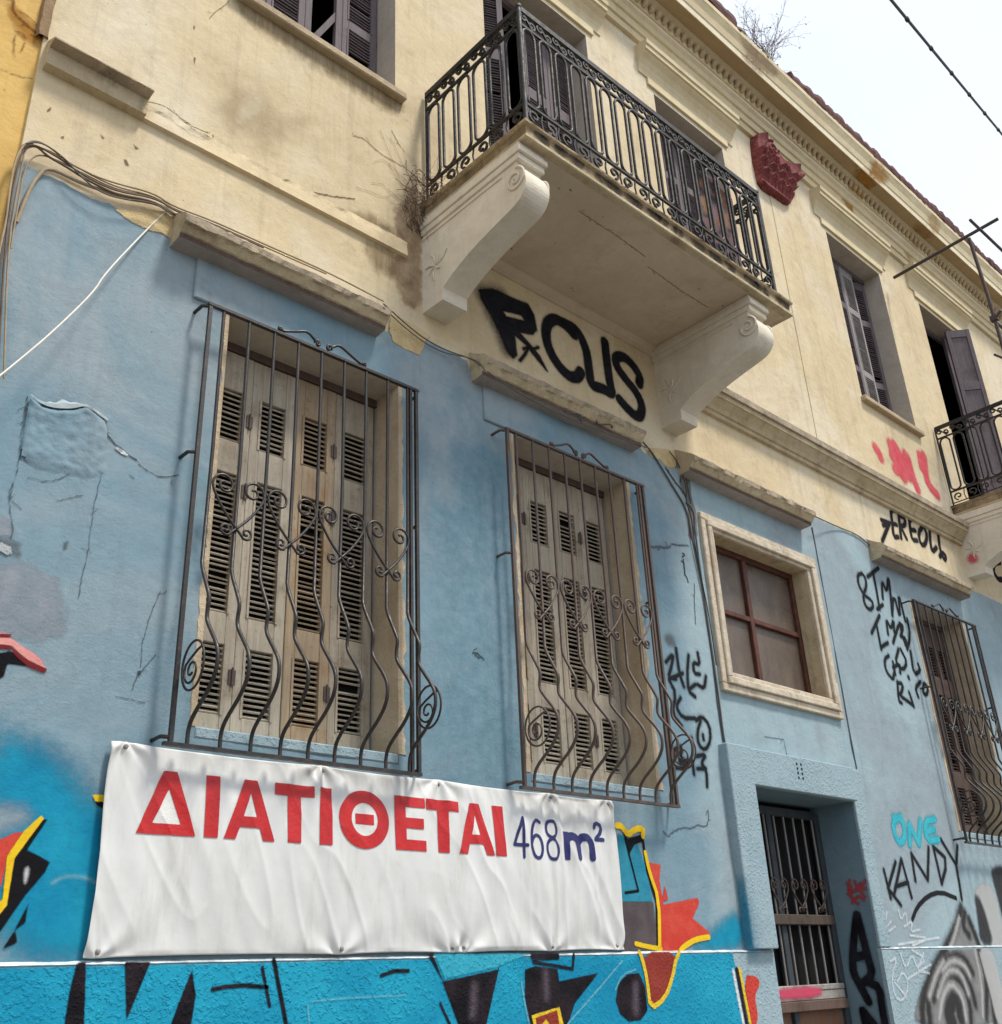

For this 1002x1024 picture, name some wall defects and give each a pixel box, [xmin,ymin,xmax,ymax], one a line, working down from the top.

crack [148,101,214,137]
corrosion [851,162,887,197]
peeling [116,209,173,239]
peeling [390,316,430,355]
crack [107,433,179,481]
crack [8,473,101,596]
crack [115,590,167,703]